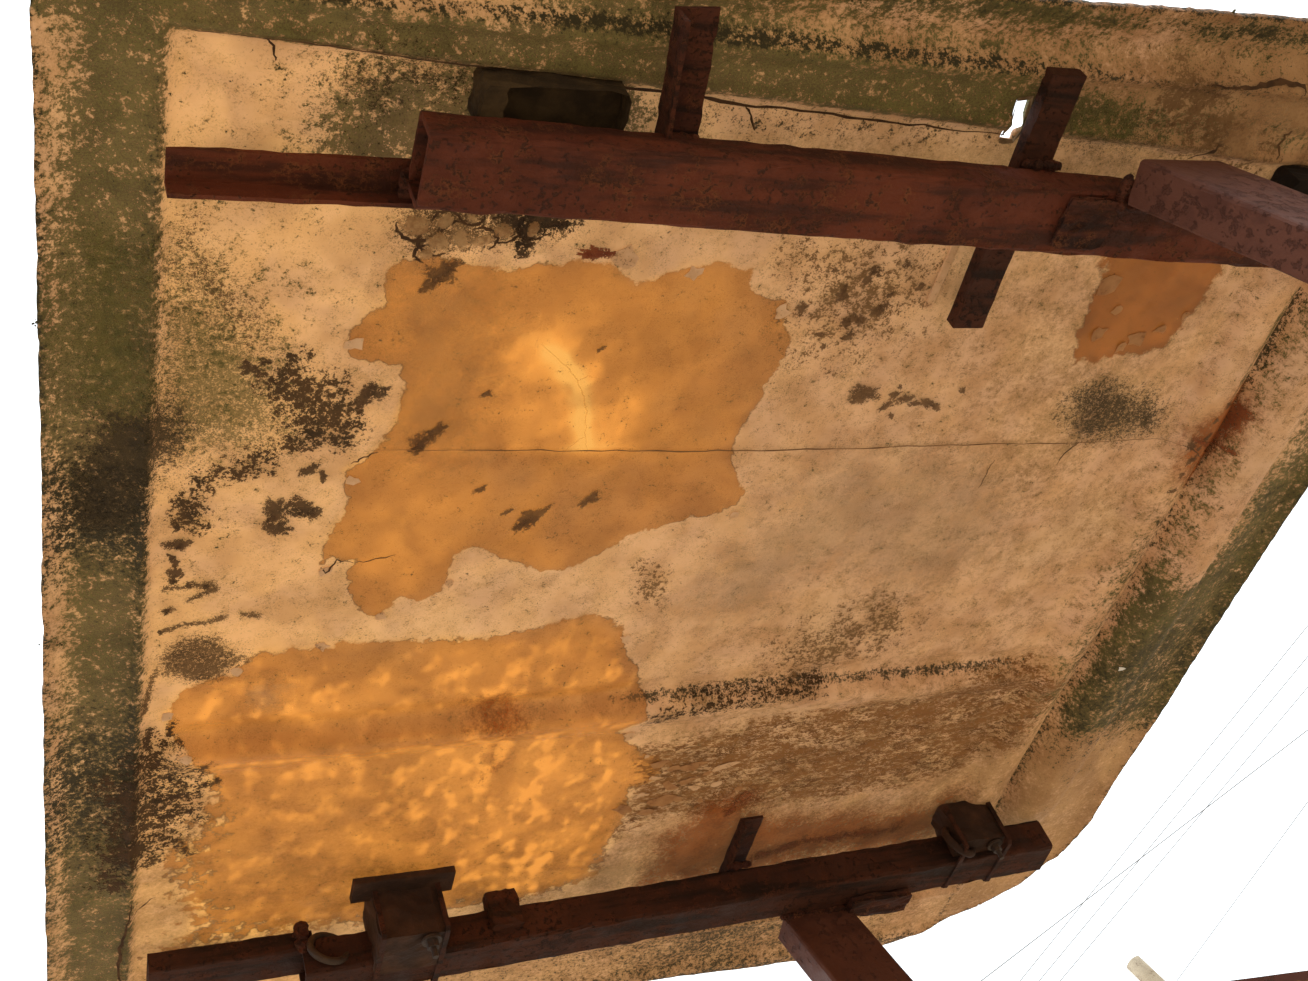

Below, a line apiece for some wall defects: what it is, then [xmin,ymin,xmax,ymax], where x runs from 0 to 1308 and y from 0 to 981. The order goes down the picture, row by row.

crack [187,28,535,73]
crack [704,96,1004,135]
crack [1211,78,1307,96]
peeling [1073,256,1223,365]
peeling [319,256,472,621]
peeling [649,291,792,531]
crack [351,438,1200,487]
water stain [1049,373,1176,451]
rust [1167,384,1254,493]
water stain [55,209,393,899]
water stain [638,582,931,726]
peeling [161,771,280,948]